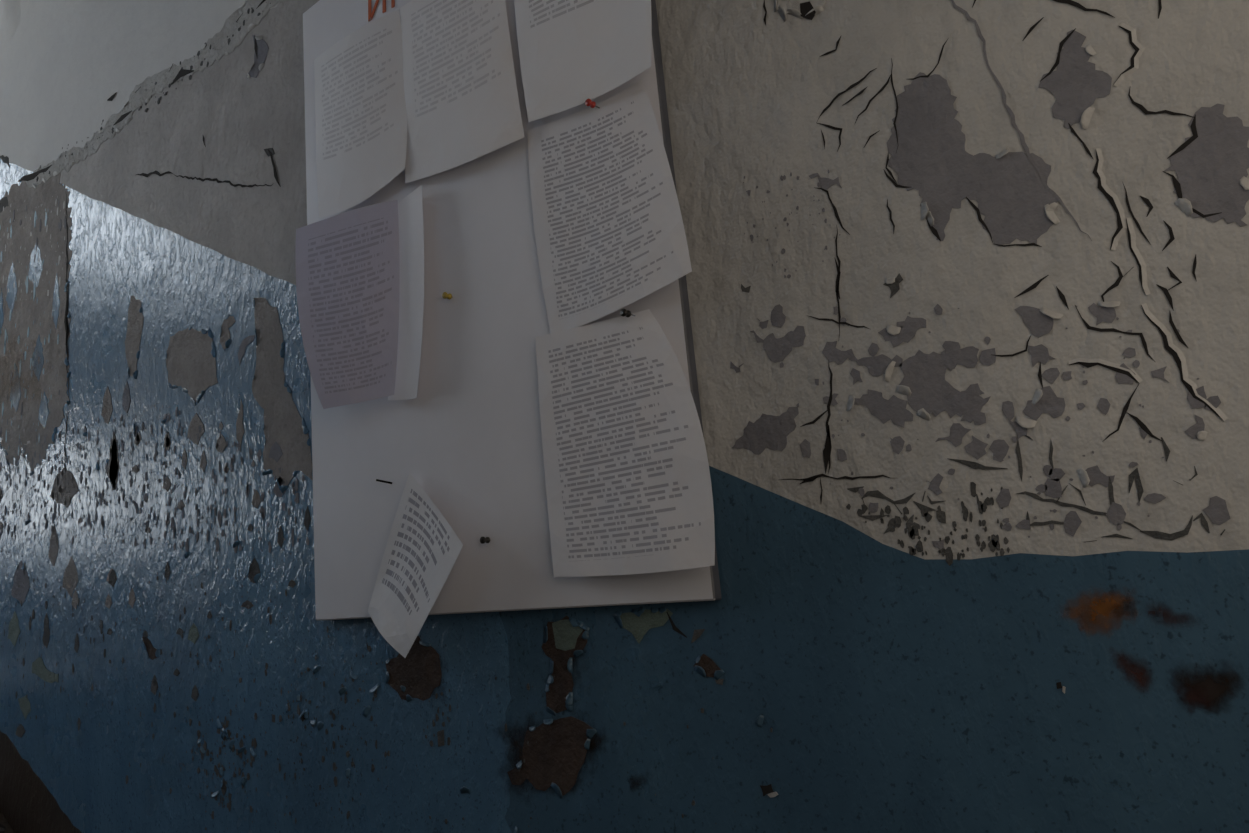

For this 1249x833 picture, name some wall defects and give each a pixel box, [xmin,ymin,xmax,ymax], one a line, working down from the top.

crack [136,148,281,188]
peeling [884,39,1060,247]
crack [1053,0,1115,18]
peeling [1039,23,1145,130]
crack [1128,88,1195,118]
peeling [1163,103,1249,227]
peeling [0,0,461,830]
peeling [732,403,811,458]
crack [780,225,890,502]
peeling [815,301,1231,566]
crack [994,123,1228,442]
peeling [504,616,601,799]